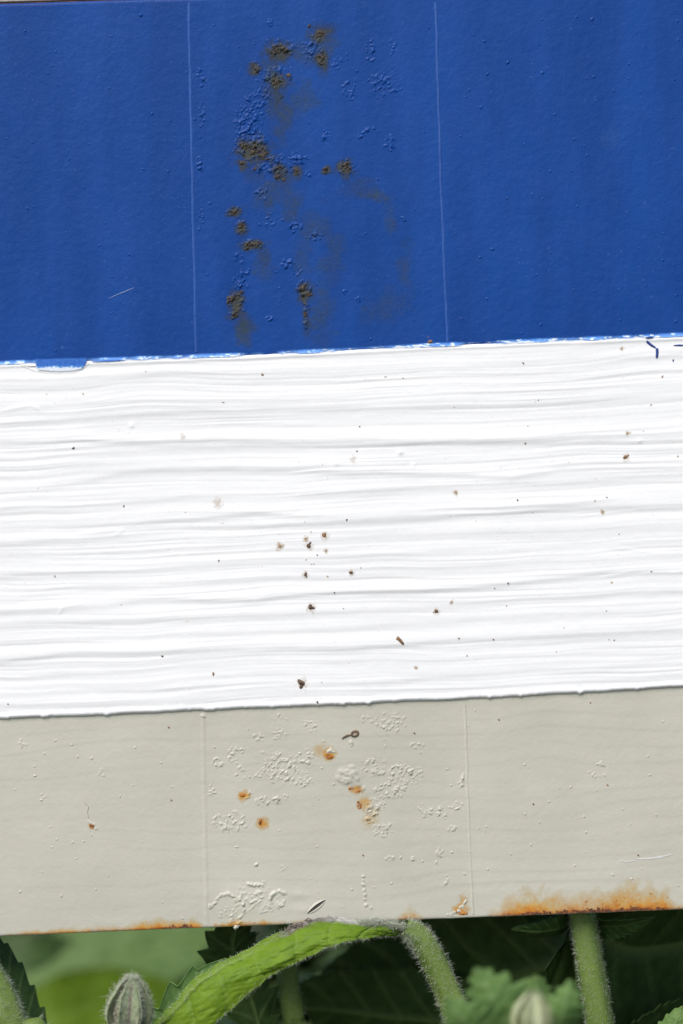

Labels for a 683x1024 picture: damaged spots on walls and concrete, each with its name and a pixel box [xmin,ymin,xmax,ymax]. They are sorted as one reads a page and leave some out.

rust [267,43,289,60]
rust [307,24,331,69]
rust [238,141,299,181]
rust [322,161,352,175]
rust [229,208,263,250]
rust [226,290,244,319]
rust [299,283,313,317]
rust [501,892,675,916]
rust [107,922,201,931]